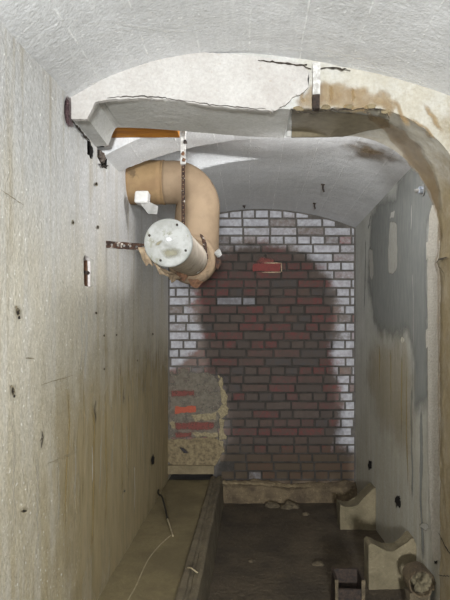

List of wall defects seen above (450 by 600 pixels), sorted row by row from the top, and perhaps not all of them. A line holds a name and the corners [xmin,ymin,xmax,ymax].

crack [258,60,351,71]
damp [291,109,389,138]
damp [364,167,433,553]
flaking render [169,375,229,453]